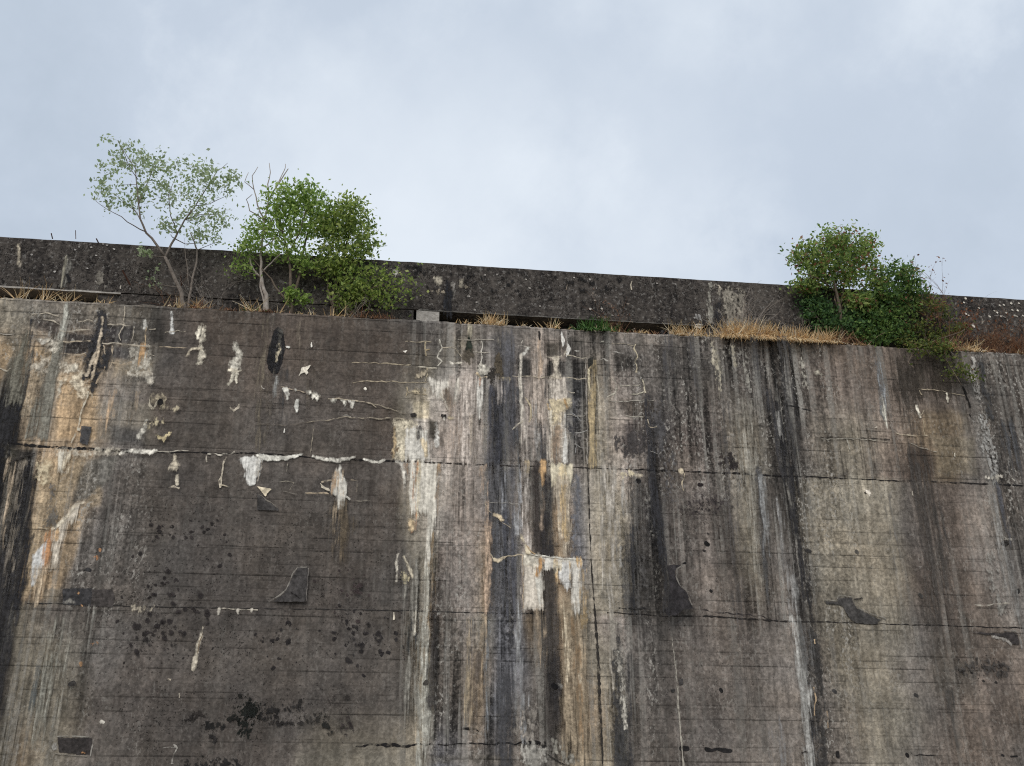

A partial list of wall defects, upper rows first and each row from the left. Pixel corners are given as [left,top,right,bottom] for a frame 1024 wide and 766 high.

damp [29,620,69,740]
damp [0,303,189,714]
crack [8,306,520,502]
damp [206,329,587,766]
damp [599,330,685,766]
damp [710,335,829,766]
damp [875,357,957,626]
damp [970,352,1024,634]